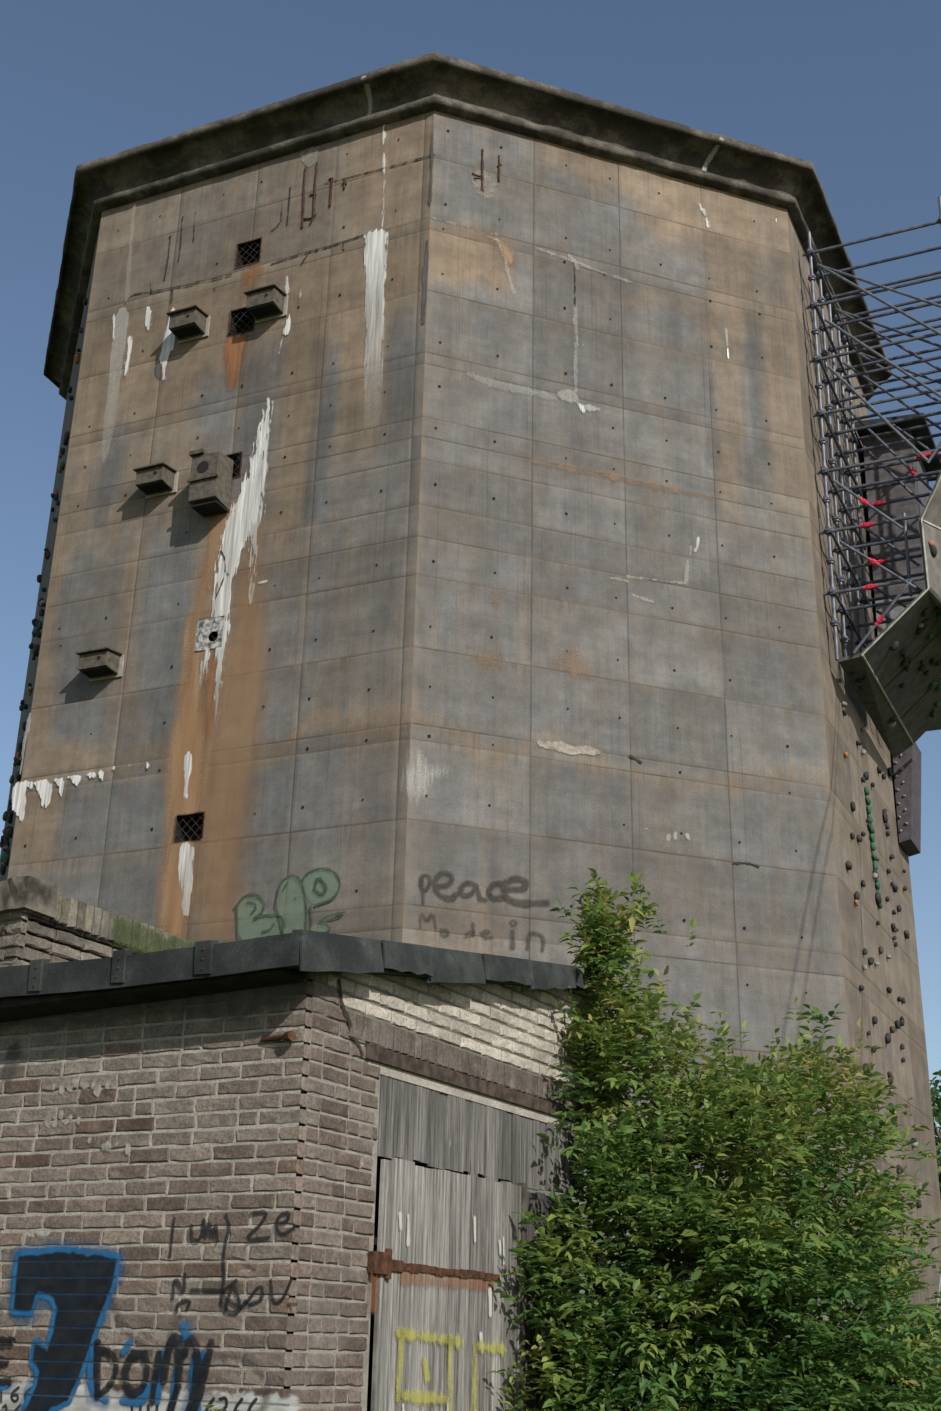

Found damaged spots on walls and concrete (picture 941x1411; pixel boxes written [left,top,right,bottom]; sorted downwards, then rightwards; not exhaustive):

damp [364,125,389,334]
rust [224,334,246,388]
damp [201,398,273,674]
damp [12,766,115,821]
damp [178,842,194,894]
rust [159,511,230,938]